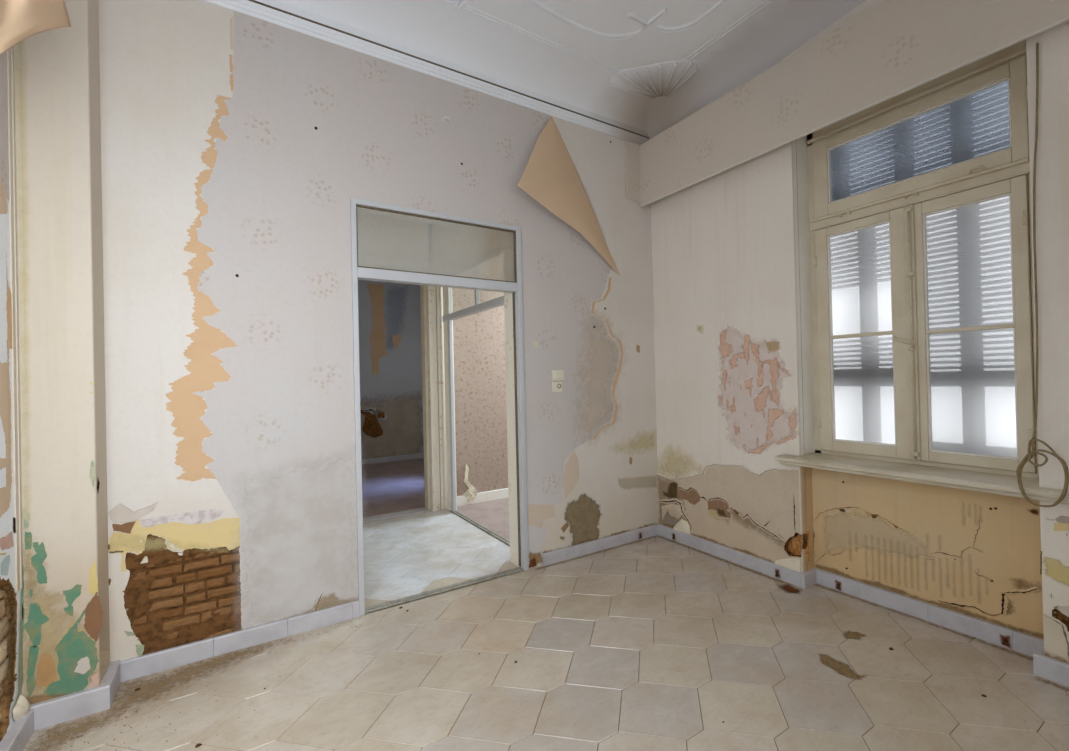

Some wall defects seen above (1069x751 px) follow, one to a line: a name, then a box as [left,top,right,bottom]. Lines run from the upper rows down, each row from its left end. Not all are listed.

peeling [0,0,71,54]
peeling [518,117,620,275]
flaking render [360,406,387,437]
flaking render [657,327,810,572]
peeling [0,508,111,742]
flaking render [108,508,243,657]
crack [658,493,1069,661]
flaking render [1044,593,1069,660]
peeling [1045,558,1069,585]
peeling [1053,516,1069,535]